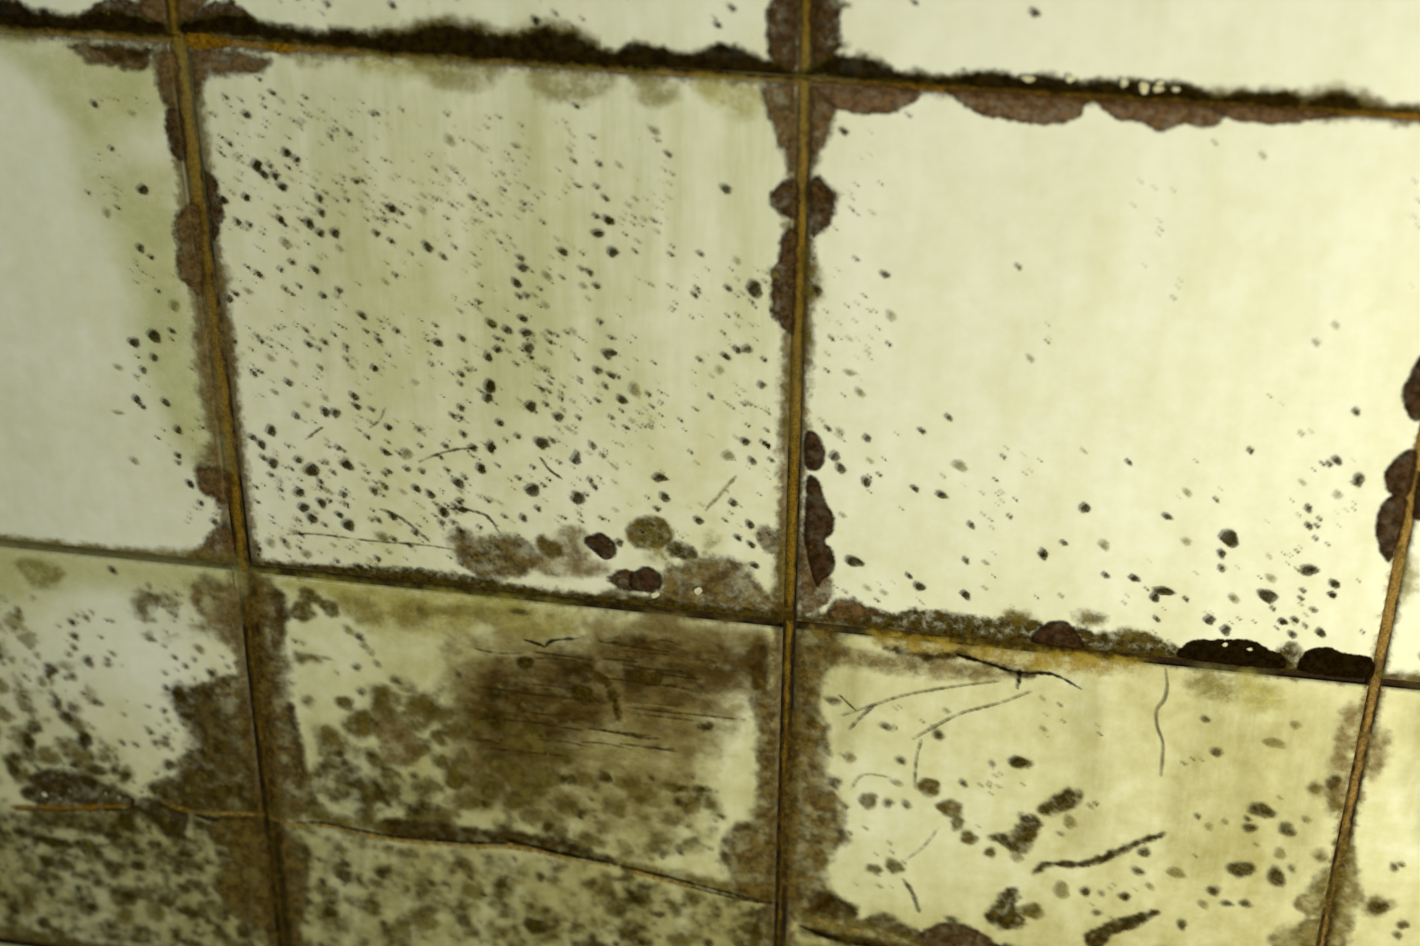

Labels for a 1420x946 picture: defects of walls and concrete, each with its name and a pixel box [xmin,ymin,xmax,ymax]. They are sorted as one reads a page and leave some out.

rust [185,33,232,50]
rust [263,42,297,54]
leakage [0,0,1420,469]
crack [840,654,1077,779]
crack [1156,673,1169,770]
crack [11,798,774,904]
crack [800,918,875,946]